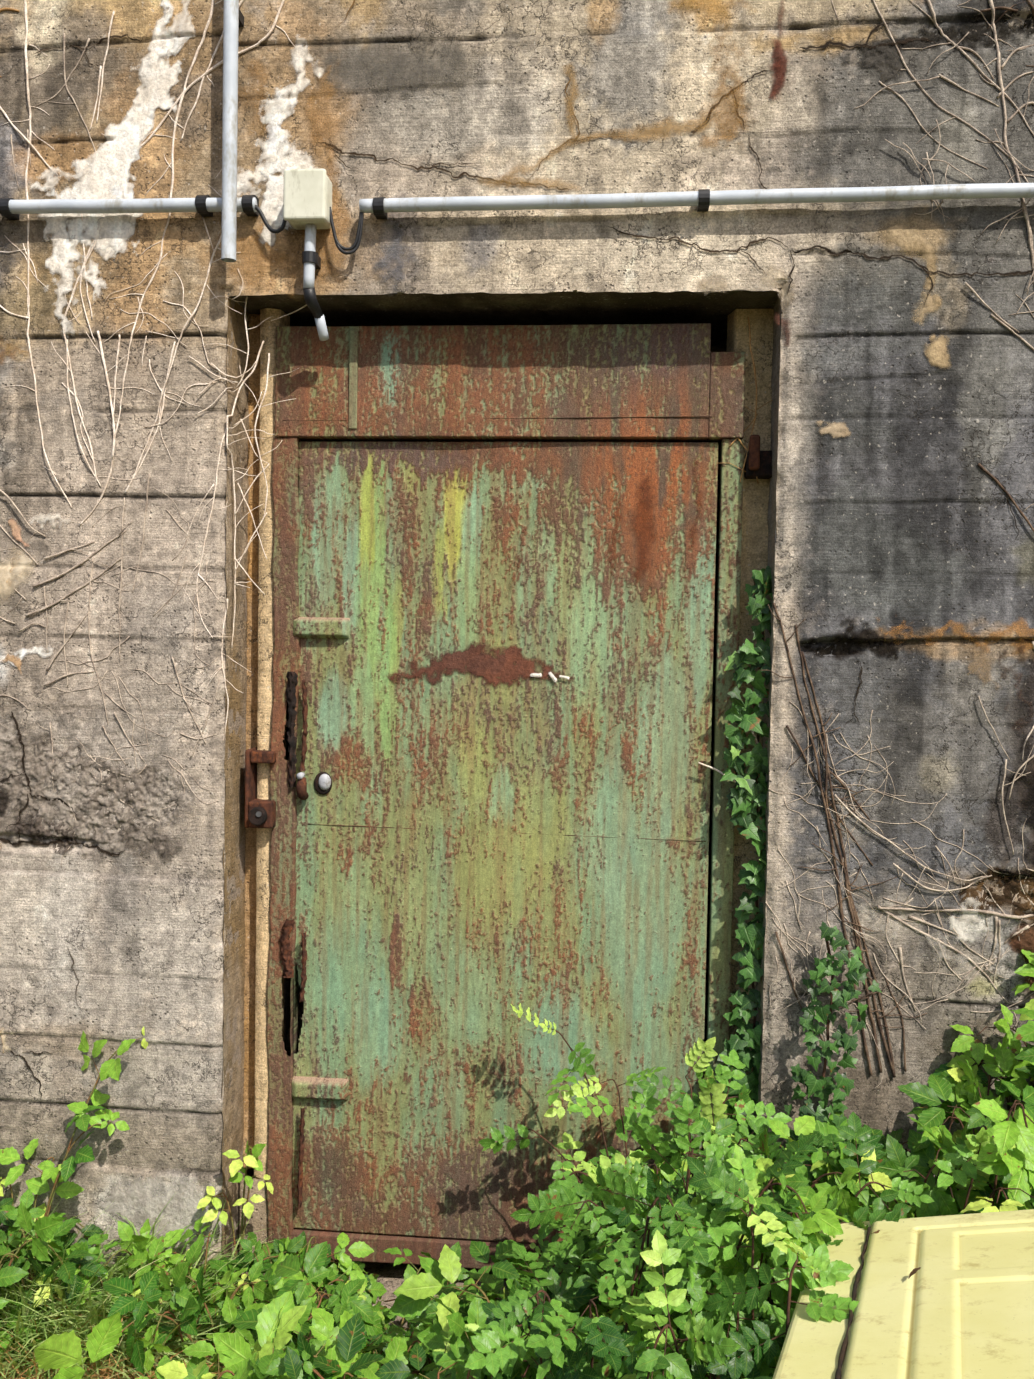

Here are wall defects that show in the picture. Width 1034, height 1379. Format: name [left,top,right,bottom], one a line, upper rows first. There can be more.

rust [770,8,788,99]
efflorescence [31,0,195,336]
leakage [237,35,322,245]
crack [318,75,624,190]
crack [608,226,1033,308]
rust [613,476,654,580]
rust [388,643,573,686]
rust [285,671,308,788]
crack [0,711,122,856]
leakage [1015,770,1034,828]
rust [279,919,307,1002]
rust [297,1106,305,1209]